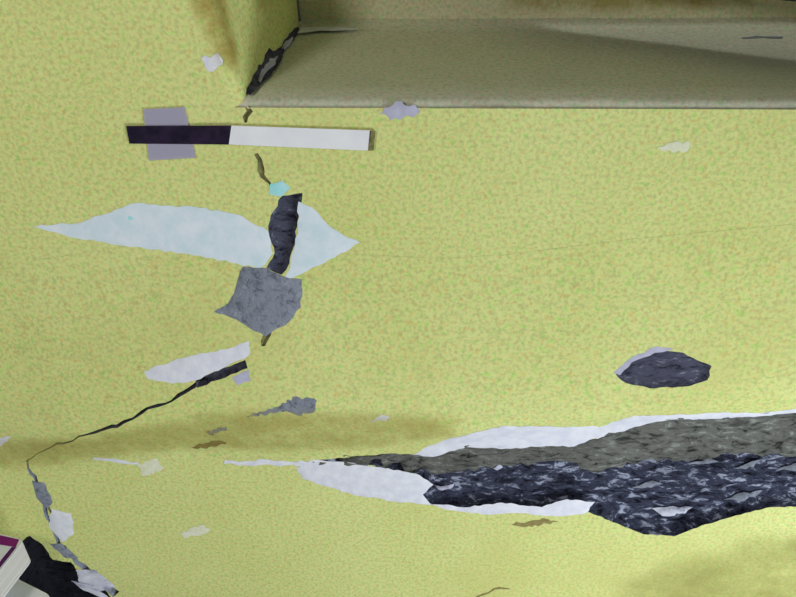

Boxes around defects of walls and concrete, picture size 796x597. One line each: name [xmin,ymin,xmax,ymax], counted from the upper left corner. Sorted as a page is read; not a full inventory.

crack [254,153,271,185]
peeling [33,181,360,336]
crack [261,333,271,346]
peeling [144,341,250,384]
spalling [614,347,711,388]
peeling [247,396,317,417]
crack [26,360,251,597]
spalling [294,409,796,536]
peeling [180,525,210,538]
spalling [19,536,118,597]